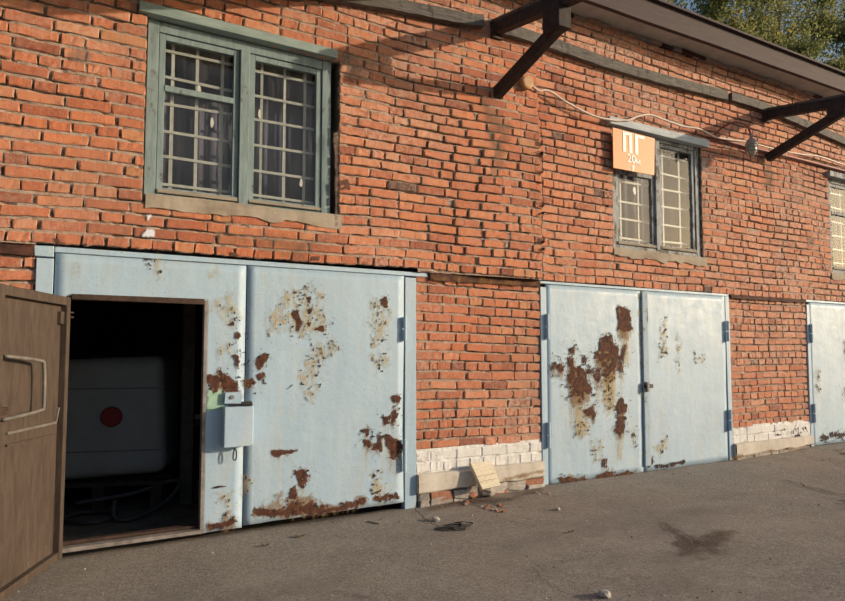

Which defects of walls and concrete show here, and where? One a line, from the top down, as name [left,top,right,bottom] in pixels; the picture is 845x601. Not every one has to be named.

peeling [267,286,328,337]
rust [206,320,270,398]
peeling [300,340,339,400]
rust [547,305,635,439]
rust [208,466,400,531]
rust [355,394,403,465]
rust [558,473,585,483]
rust [597,458,637,479]
rust [648,457,685,469]
rust [820,429,845,443]